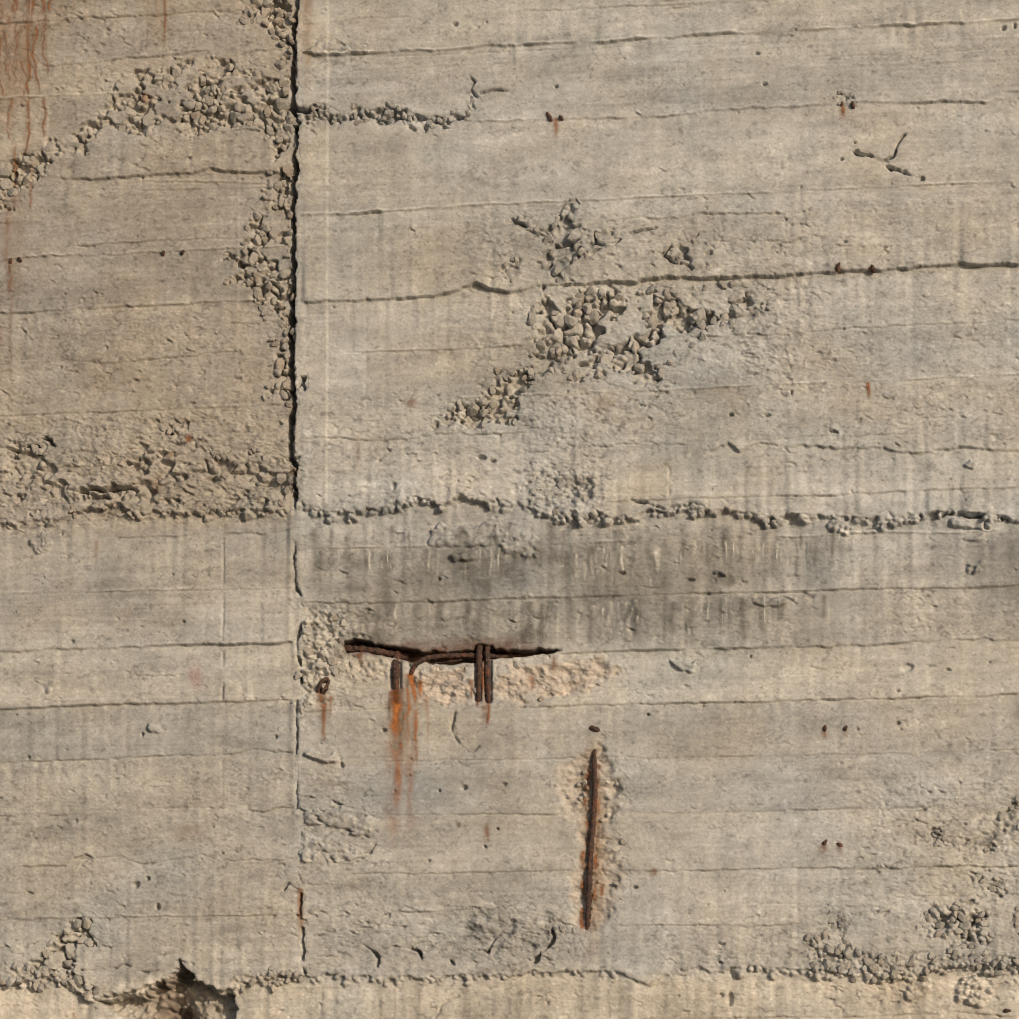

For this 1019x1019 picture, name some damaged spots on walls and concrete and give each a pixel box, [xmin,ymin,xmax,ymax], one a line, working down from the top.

corrosion [0,0,52,111]
crack [852,132,924,182]
spalling [295,602,477,715]
corrosion [391,674,422,745]
spalling [490,650,628,712]
spalling [450,731,635,969]